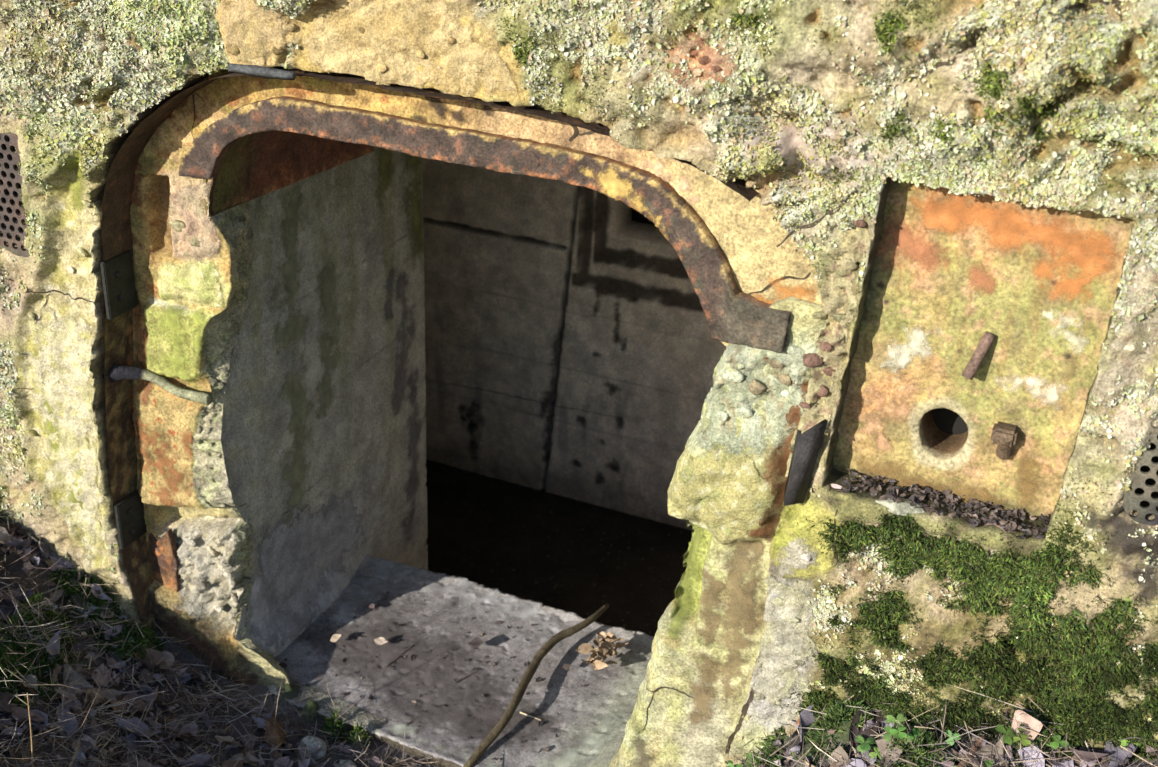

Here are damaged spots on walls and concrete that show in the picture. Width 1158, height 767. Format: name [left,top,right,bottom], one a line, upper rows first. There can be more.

leakage [594,285,637,350]
corrosion [756,285,813,304]
corrosion [877,193,1114,299]
corrosion [132,291,192,507]
leakage [385,270,422,540]
leakage [539,331,563,462]
corrosion [859,456,1001,509]
leakage [669,524,702,638]
corrosion [689,380,808,724]
leakage [250,558,560,752]
leakage [537,711,627,767]
leakage [633,739,652,767]